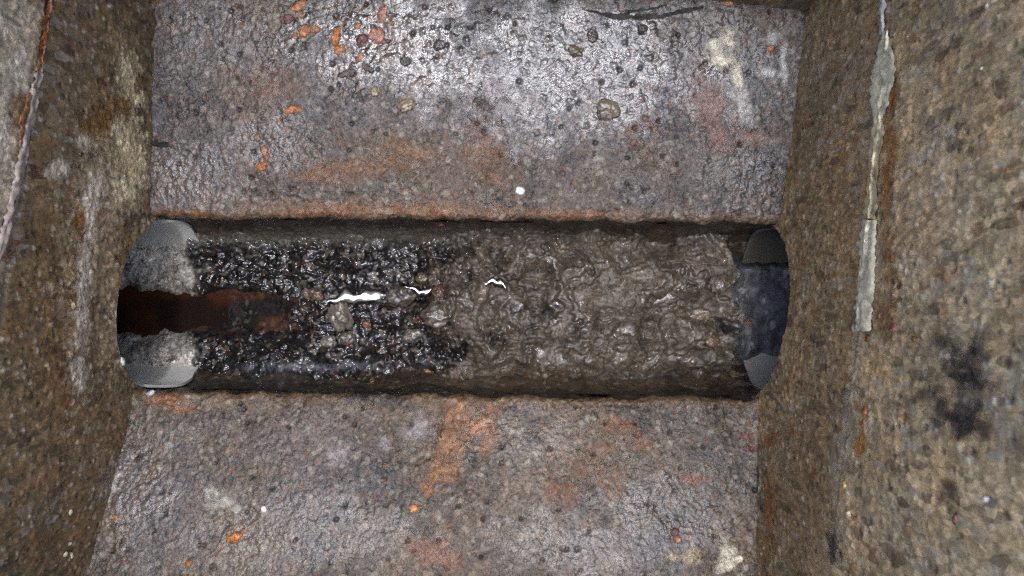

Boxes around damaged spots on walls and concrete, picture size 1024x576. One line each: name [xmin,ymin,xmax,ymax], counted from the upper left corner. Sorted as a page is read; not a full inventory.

crack [582,4,704,21]
damp [913,335,988,439]
corrosion [420,398,498,497]